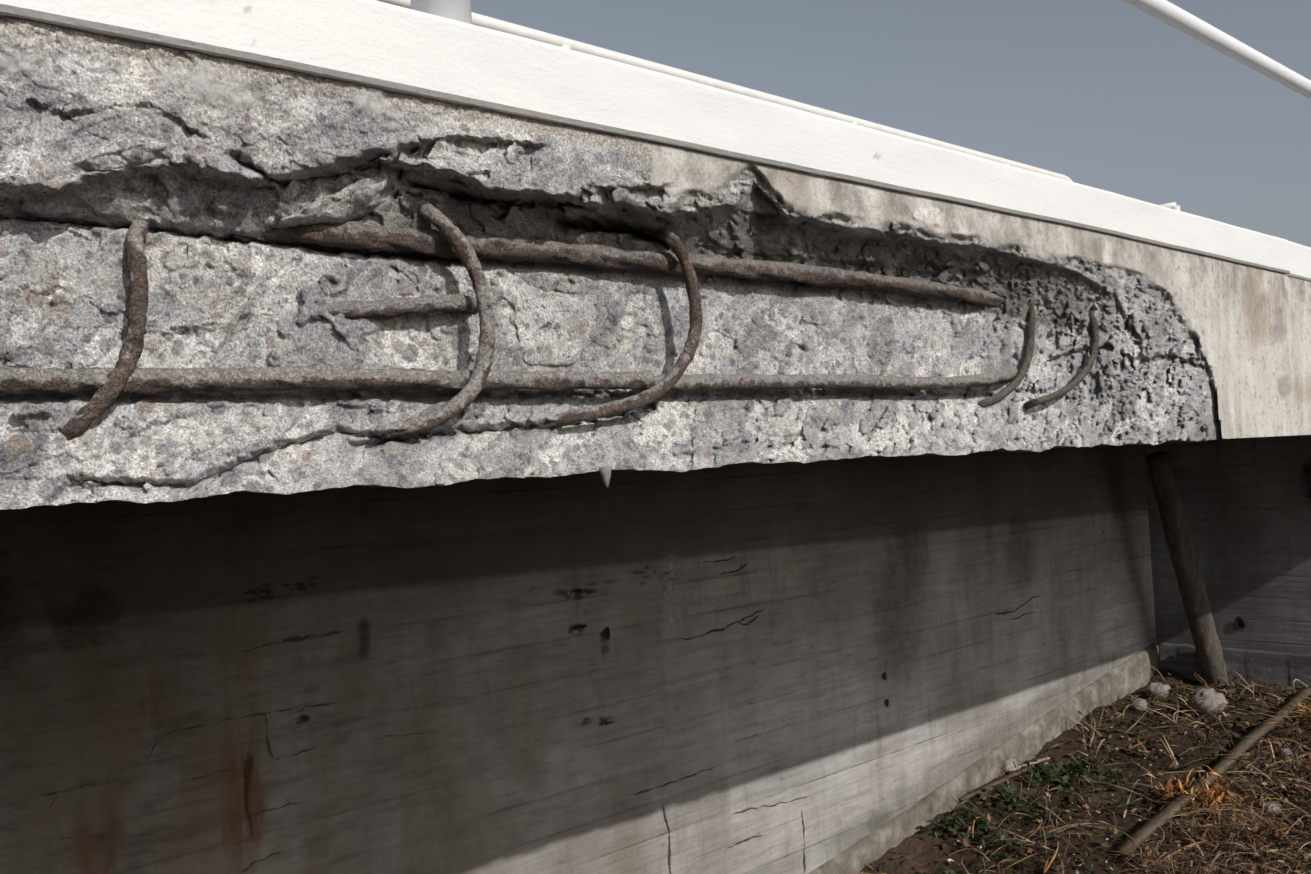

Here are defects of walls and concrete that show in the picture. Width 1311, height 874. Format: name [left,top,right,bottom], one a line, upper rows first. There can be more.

crack [229,154,552,205]
crack [0,217,317,249]
crack [573,226,666,243]
spalling [0,92,1222,510]
crack [78,425,538,488]
crack [702,556,748,575]
crack [661,608,765,641]
crack [146,703,338,760]
crack [631,767,715,874]